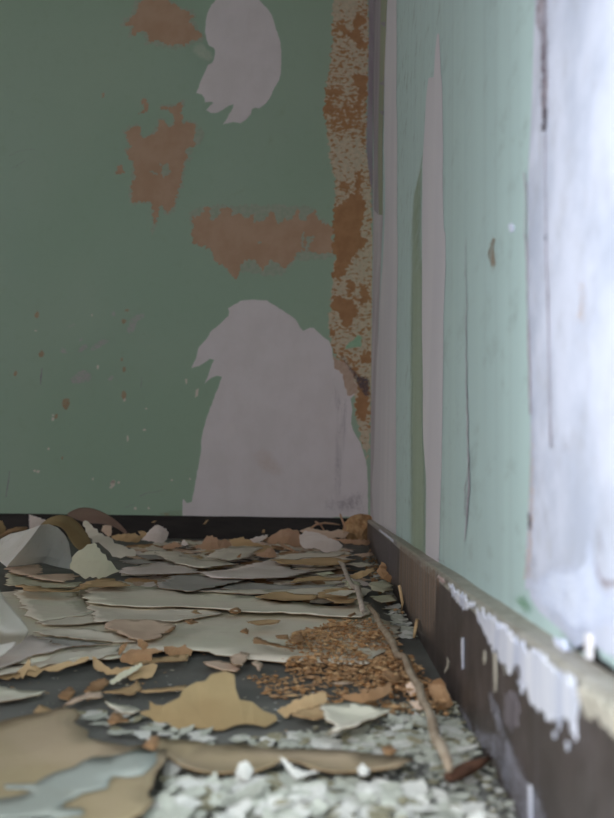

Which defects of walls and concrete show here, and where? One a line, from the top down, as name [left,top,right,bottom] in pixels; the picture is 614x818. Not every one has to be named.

peeling [120,0,281,124]
peeling [115,98,205,235]
peeling [182,0,398,543]
peeling [422,34,446,562]
peeling [525,0,614,657]
crack [463,296,471,541]
peeling [78,709,217,745]
peeling [203,652,263,672]
peeling [240,619,305,650]
peeling [149,678,500,818]
peeling [373,562,418,639]
peeling [437,575,614,751]